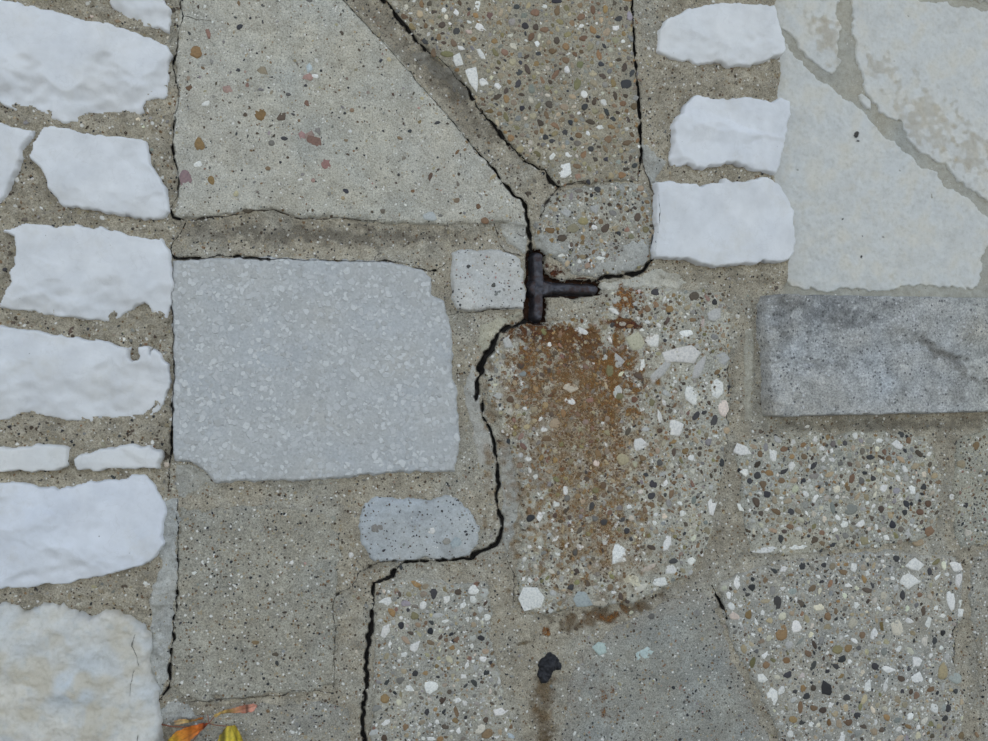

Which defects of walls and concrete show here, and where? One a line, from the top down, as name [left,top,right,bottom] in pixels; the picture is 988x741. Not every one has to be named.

crack [343,0,582,256]
crack [595,0,660,282]
rust [502,283,663,589]